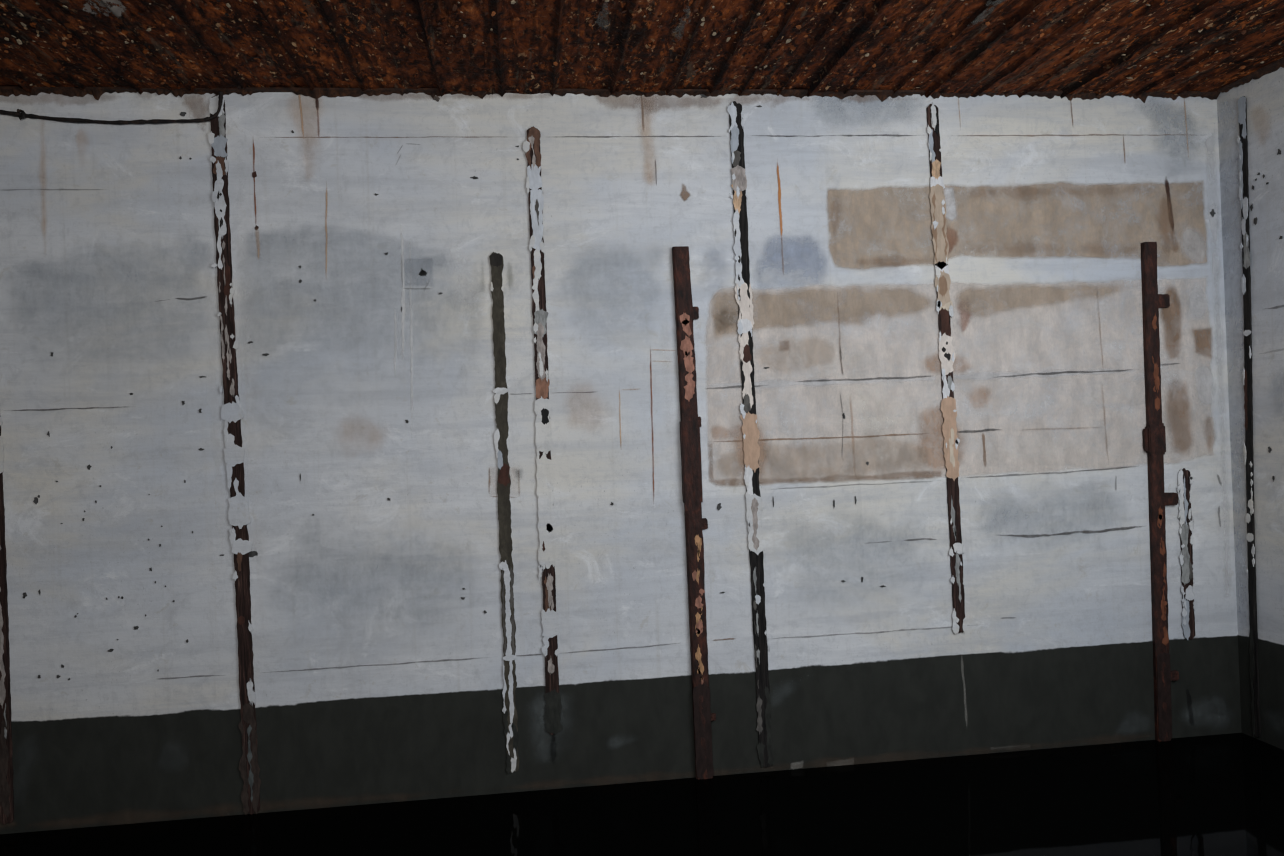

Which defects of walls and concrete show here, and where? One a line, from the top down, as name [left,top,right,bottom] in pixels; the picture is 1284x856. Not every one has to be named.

rust [213,156,227,175]
rust [222,264,231,301]
rust [0,86,517,134]
peeling [494,429,510,470]
peeling [727,102,774,664]
rust [533,57,1284,144]
peeling [927,102,954,318]
peeling [938,332,967,634]
leakage [707,183,1213,485]
rust [1157,507,1169,646]
peeling [1177,469,1196,640]
peeling [499,560,517,773]